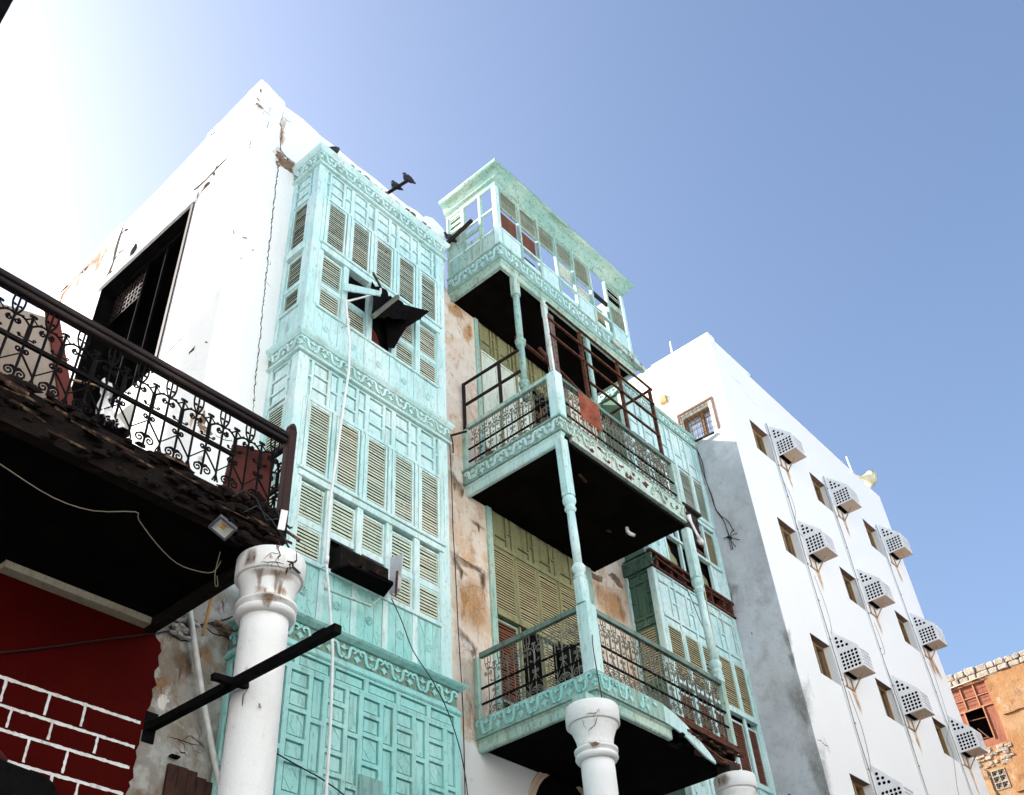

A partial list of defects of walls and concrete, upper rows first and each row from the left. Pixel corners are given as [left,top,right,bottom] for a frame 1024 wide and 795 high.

spalling [272,148,295,176]
crack [192,108,283,408]
peeling [197,410,213,436]
crack [263,539,301,575]
peeling [157,692,170,711]